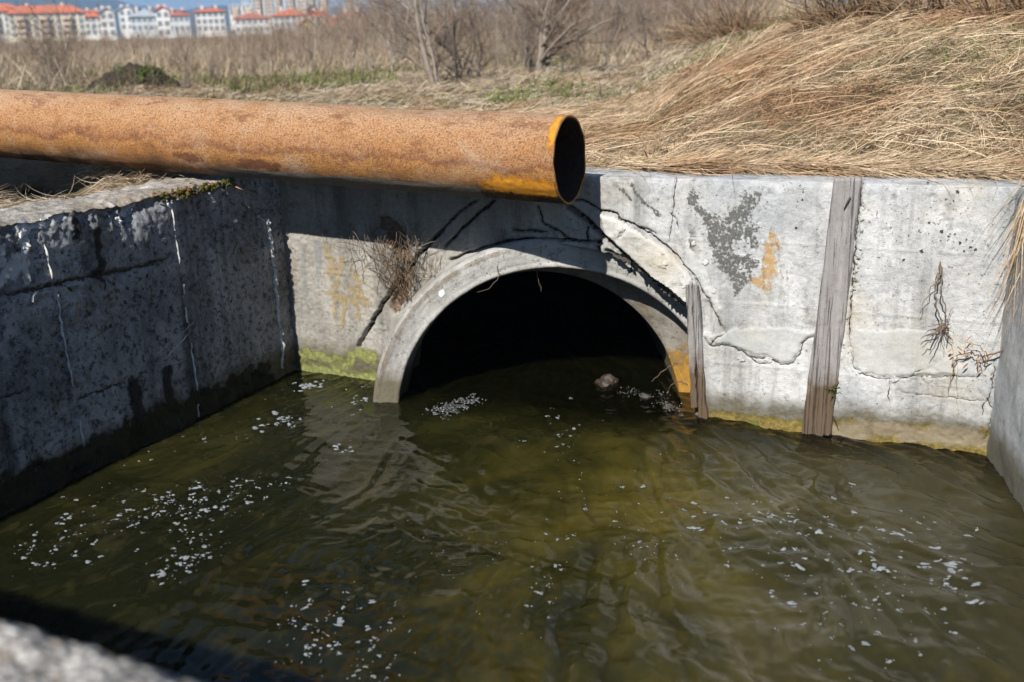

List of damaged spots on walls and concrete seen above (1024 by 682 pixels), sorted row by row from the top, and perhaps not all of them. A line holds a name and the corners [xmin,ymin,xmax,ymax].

rust [548,116,563,147]
rust [238,159,281,171]
rust [481,175,558,198]
crack [0,258,168,296]
damp [66,214,107,283]
crack [364,179,811,365]
rust [752,232,788,289]
damp [57,294,74,386]
damp [273,269,286,368]
damp [128,376,147,422]
damp [162,343,198,403]